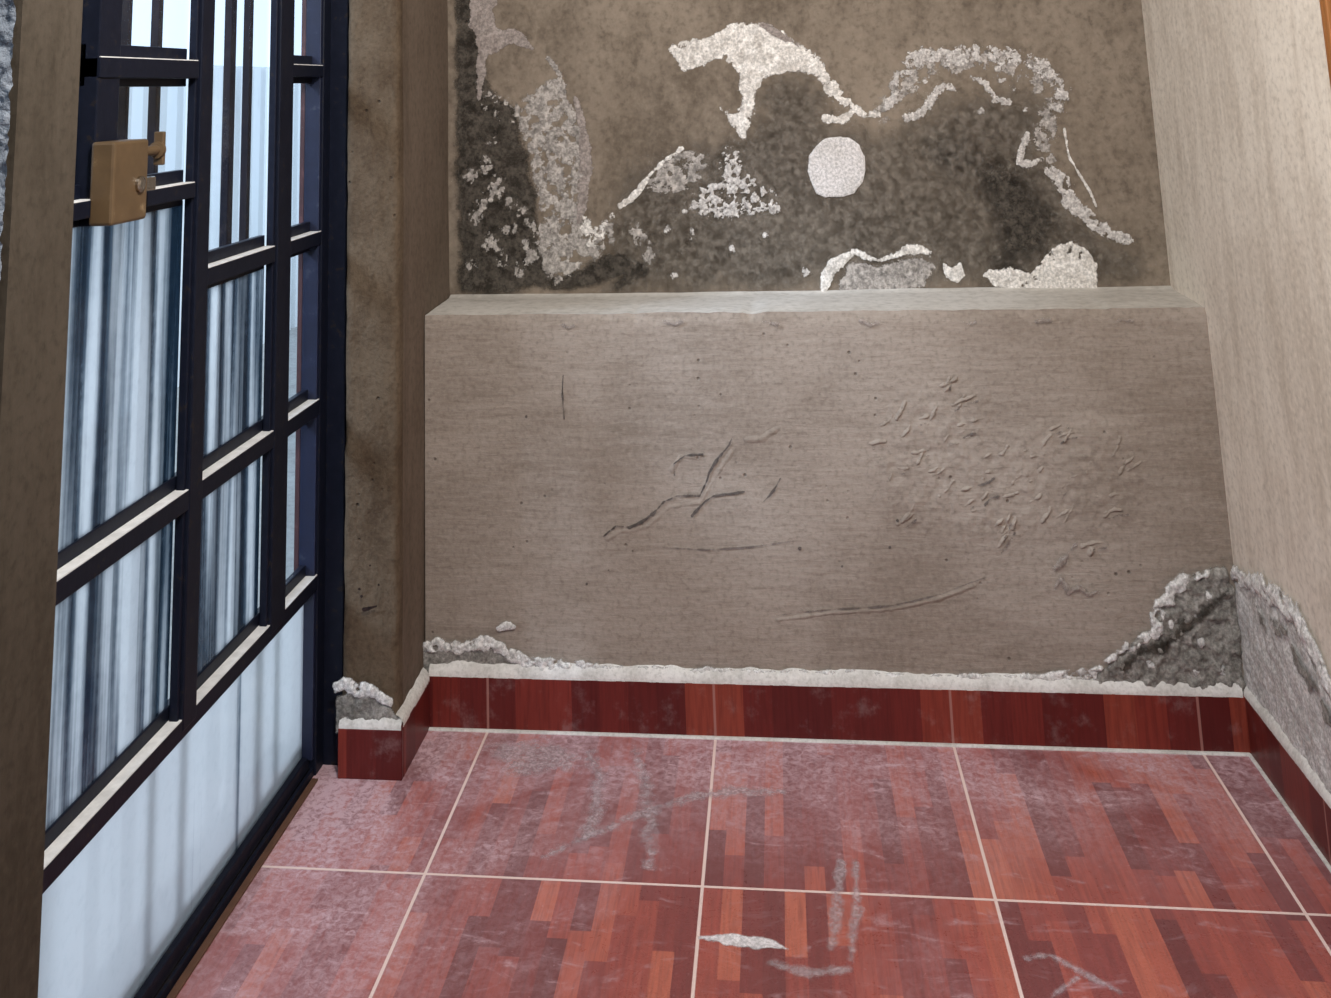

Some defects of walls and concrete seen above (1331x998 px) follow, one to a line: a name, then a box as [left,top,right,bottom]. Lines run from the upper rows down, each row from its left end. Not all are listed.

peeling [668,22,881,138]
peeling [820,244,965,292]
peeling [983,241,1098,288]
crack [604,426,781,550]
flaking render [423,621,593,673]
flaking render [332,677,399,733]
flaking render [1087,565,1331,794]